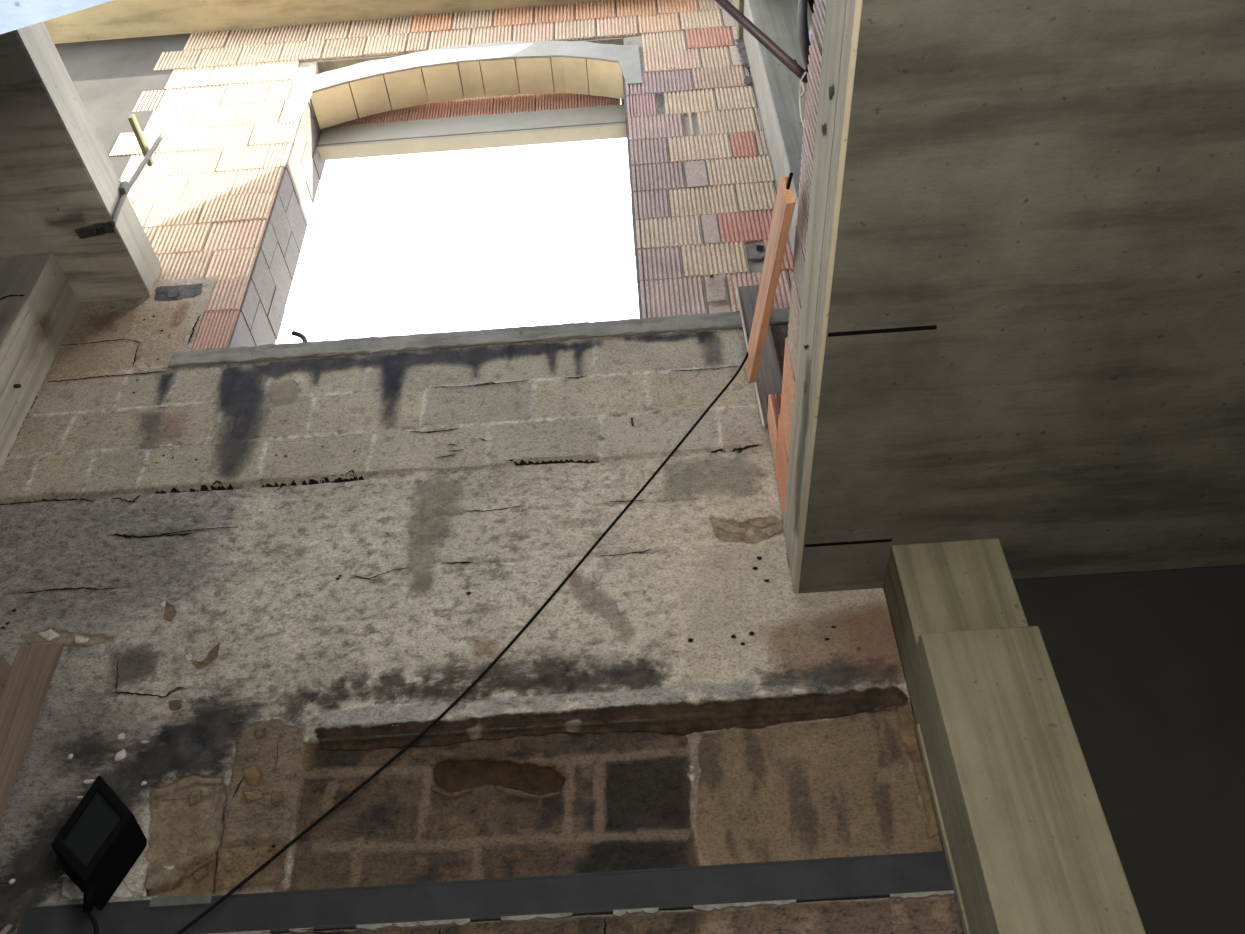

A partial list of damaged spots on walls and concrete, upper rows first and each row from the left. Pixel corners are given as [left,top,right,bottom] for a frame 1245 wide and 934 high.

leakage [625,332,719,363]
crack [2,339,168,467]
leakage [146,373,173,432]
leakage [221,341,600,472]
crack [0,470,364,505]
crack [111,527,234,538]
leakage [415,479,457,588]
spalling [710,515,784,582]
crack [24,586,114,594]
leakage [153,709,244,778]
spalling [315,687,940,839]
leakage [0,830,64,932]